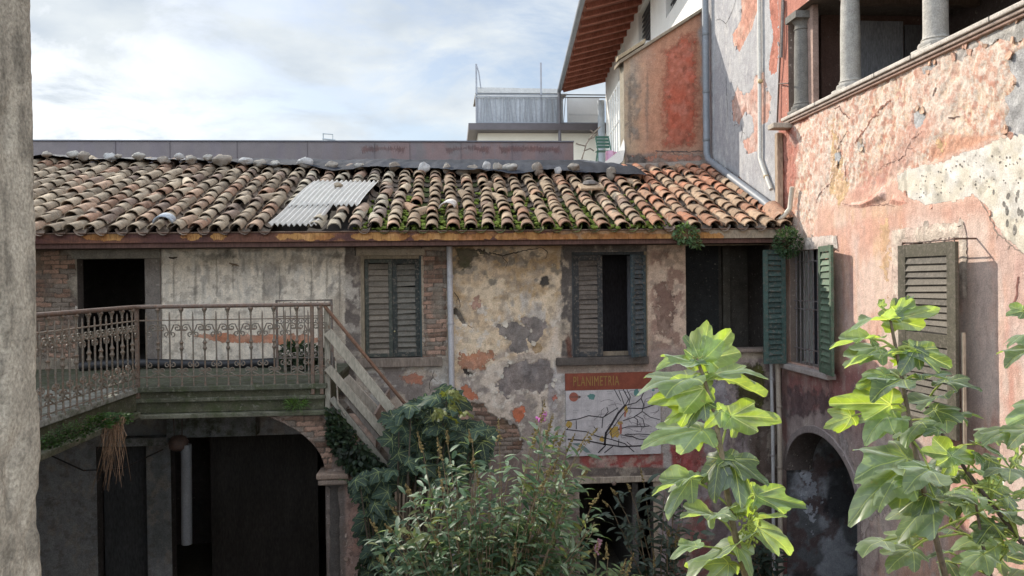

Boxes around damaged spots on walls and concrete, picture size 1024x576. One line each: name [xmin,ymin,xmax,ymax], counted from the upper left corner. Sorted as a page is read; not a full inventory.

peeling [732,0,780,154]
spalling [951,18,1024,139]
crack [816,100,892,206]
peeling [903,151,1023,235]
crack [469,247,548,266]
flaking render [422,250,558,441]